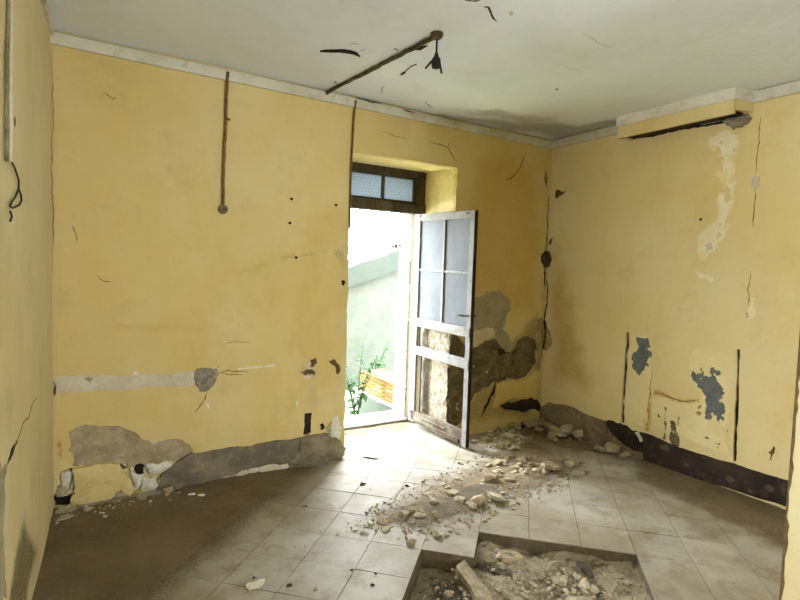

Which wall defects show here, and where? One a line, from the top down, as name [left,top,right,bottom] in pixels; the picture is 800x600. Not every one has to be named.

peeling [696,114,752,260]
crack [751,117,761,226]
crack [543,174,552,350]
spalling [420,291,541,426]
peeling [631,335,655,375]
peeling [689,367,726,423]
crack [5,398,37,476]
spalling [69,424,193,474]
spalling [54,494,71,505]